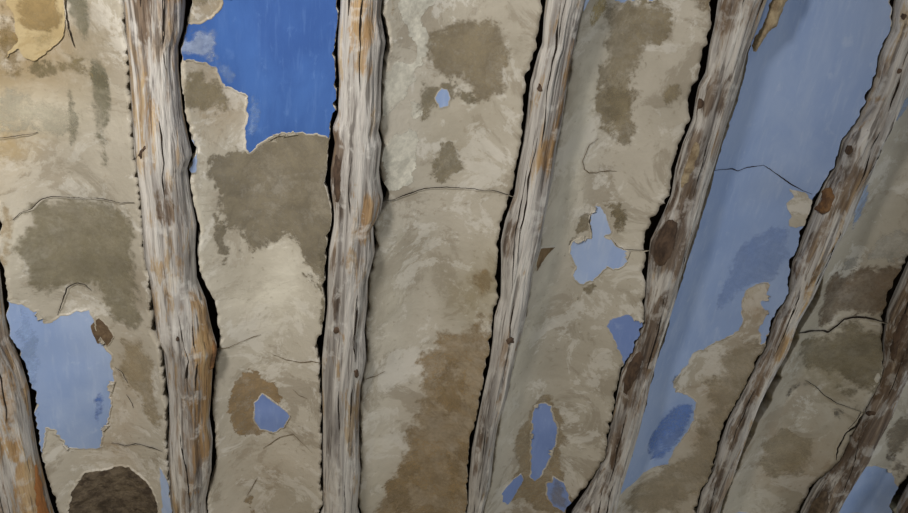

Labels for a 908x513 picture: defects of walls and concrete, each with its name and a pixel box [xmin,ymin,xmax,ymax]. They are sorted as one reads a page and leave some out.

peeling [181,0,338,154]
damp [382,0,508,191]
damp [591,0,673,144]
damp [207,133,331,323]
crack [383,187,515,202]
peeling [620,0,892,495]
crack [715,165,811,194]
peeling [6,300,117,513]
flaking render [65,464,172,513]
damp [377,321,491,513]
peeling [501,402,571,513]
peeling [839,464,899,513]